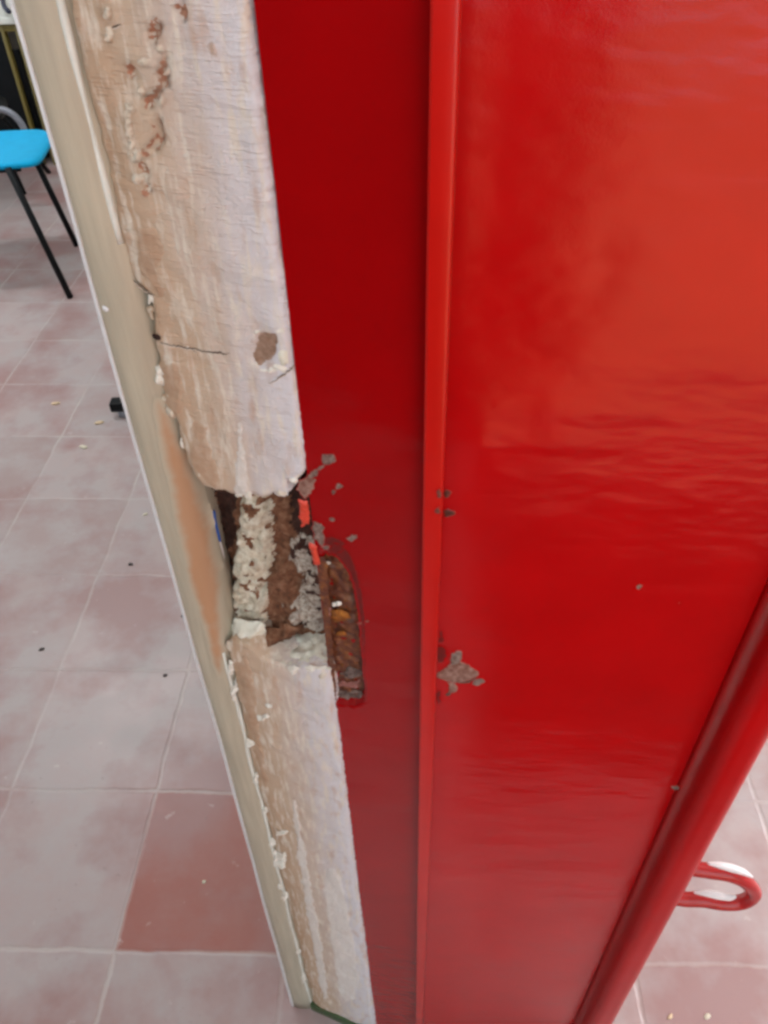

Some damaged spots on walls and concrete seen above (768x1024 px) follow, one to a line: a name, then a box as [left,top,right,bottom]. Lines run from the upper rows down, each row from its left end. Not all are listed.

crack [160,342,229,356]
spalling [251,328,289,373]
spalling [155,365,176,418]
crack [269,364,295,384]
spalling [212,453,337,701]
corrosion [317,535,367,700]
peeling [437,650,486,696]
flaking render [268,830,289,870]